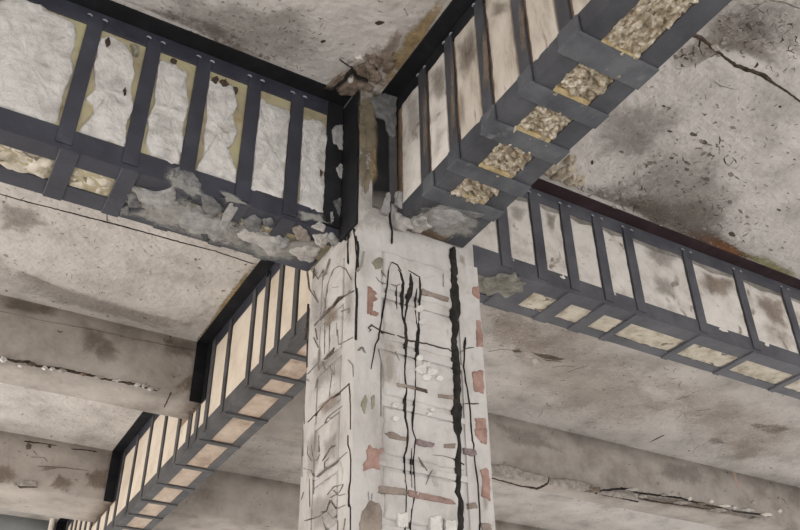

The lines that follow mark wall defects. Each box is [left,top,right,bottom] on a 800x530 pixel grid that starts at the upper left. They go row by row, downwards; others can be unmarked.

crack [748,0,800,13]
spalling [211,76,238,95]
spalling [324,44,397,138]
crack [693,34,800,102]
peeling [120,170,342,263]
peeling [379,191,485,234]
crack [301,202,481,530]